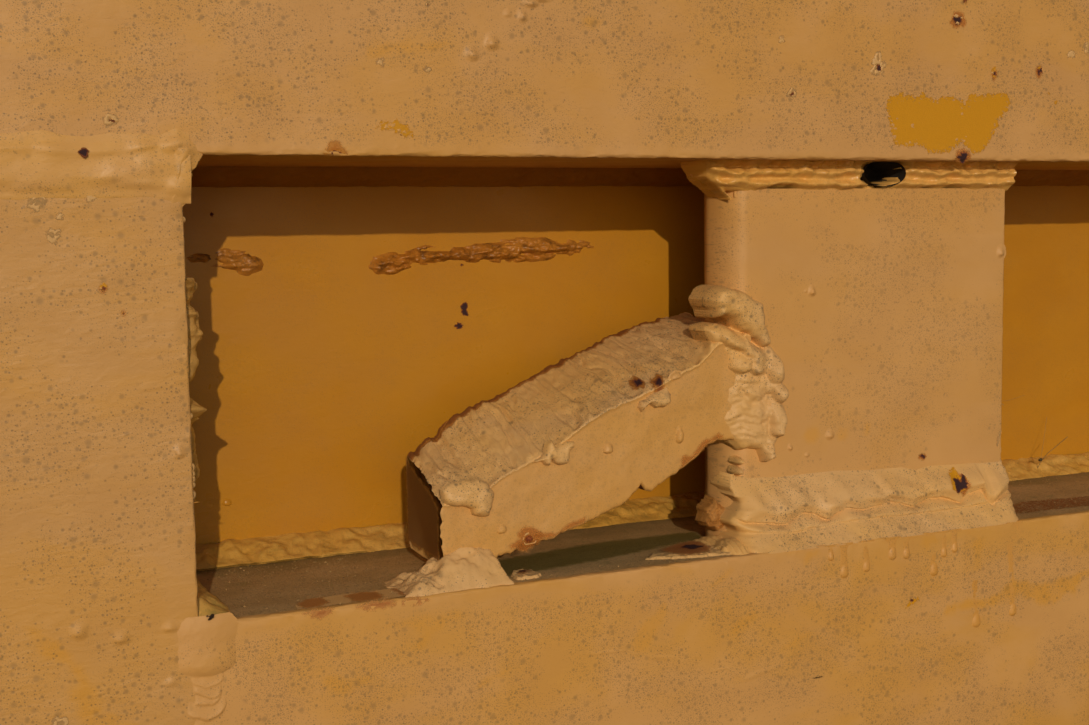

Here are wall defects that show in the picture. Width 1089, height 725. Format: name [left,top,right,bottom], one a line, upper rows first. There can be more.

corrosion [950,0,967,27]
peeling [885,91,1011,155]
corrosion [956,150,970,163]
corrosion [406,318,665,561]
corrosion [949,467,970,494]
peeling [646,541,731,560]